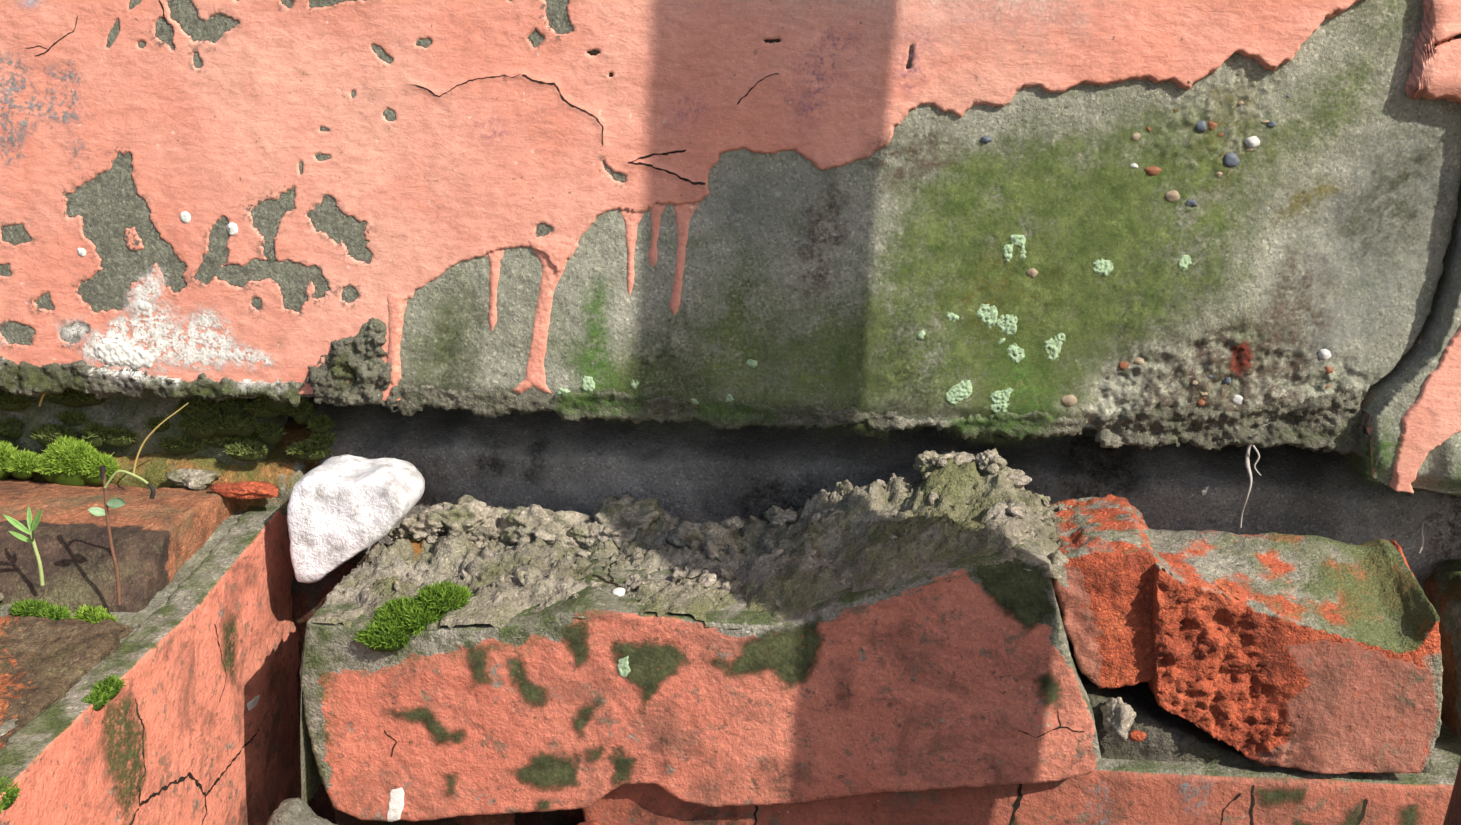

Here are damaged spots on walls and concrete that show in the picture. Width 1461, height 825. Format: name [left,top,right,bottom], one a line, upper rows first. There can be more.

crack [1424,34,1461,53]
crack [410,74,705,185]
flaking render [0,0,1461,494]
leakage [61,269,279,387]
crack [130,698,260,825]
crack [751,805,759,825]
crack [1009,784,1023,825]